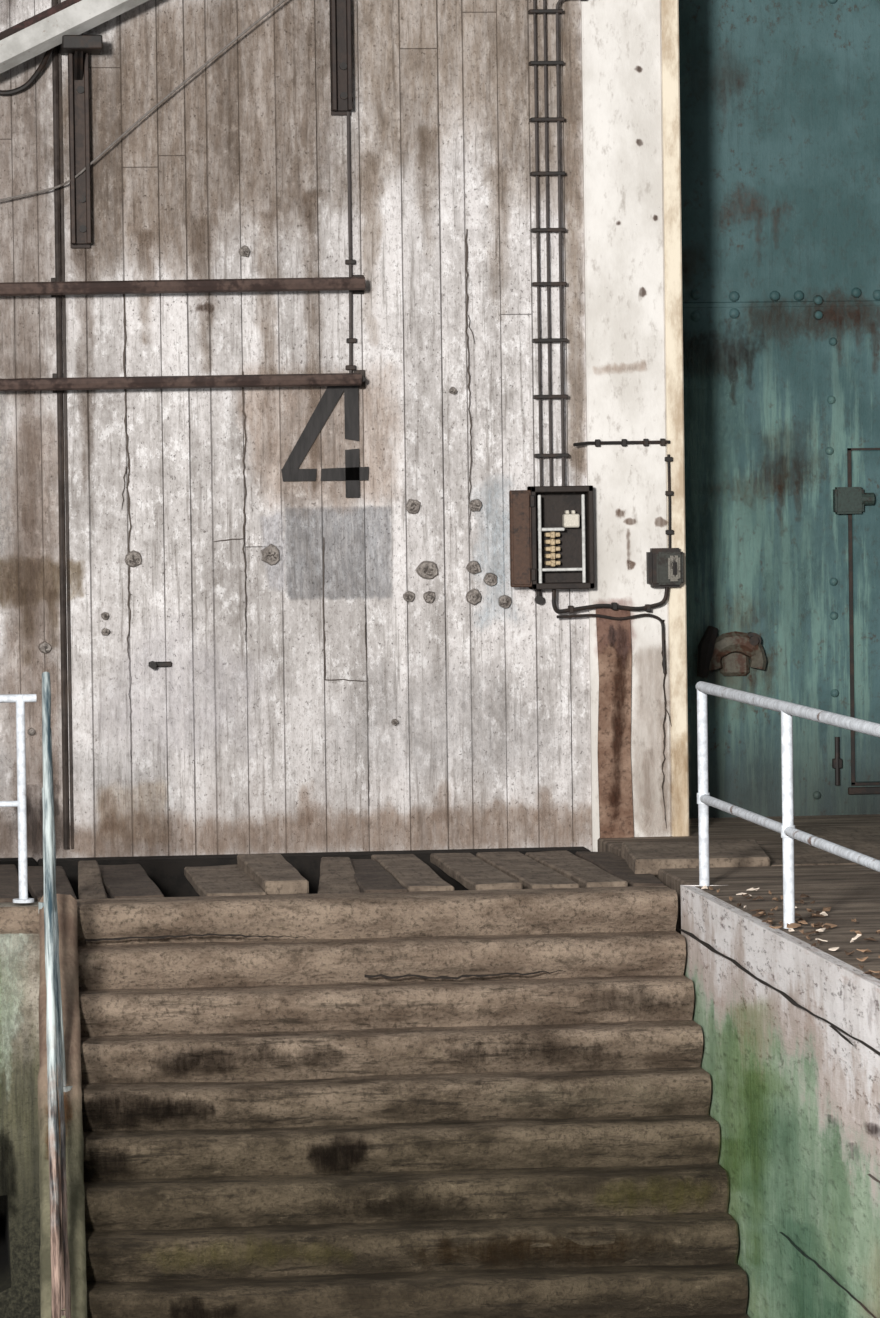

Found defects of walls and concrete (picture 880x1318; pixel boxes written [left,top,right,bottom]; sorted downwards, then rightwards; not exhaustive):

leakage [0,933,23,1058]